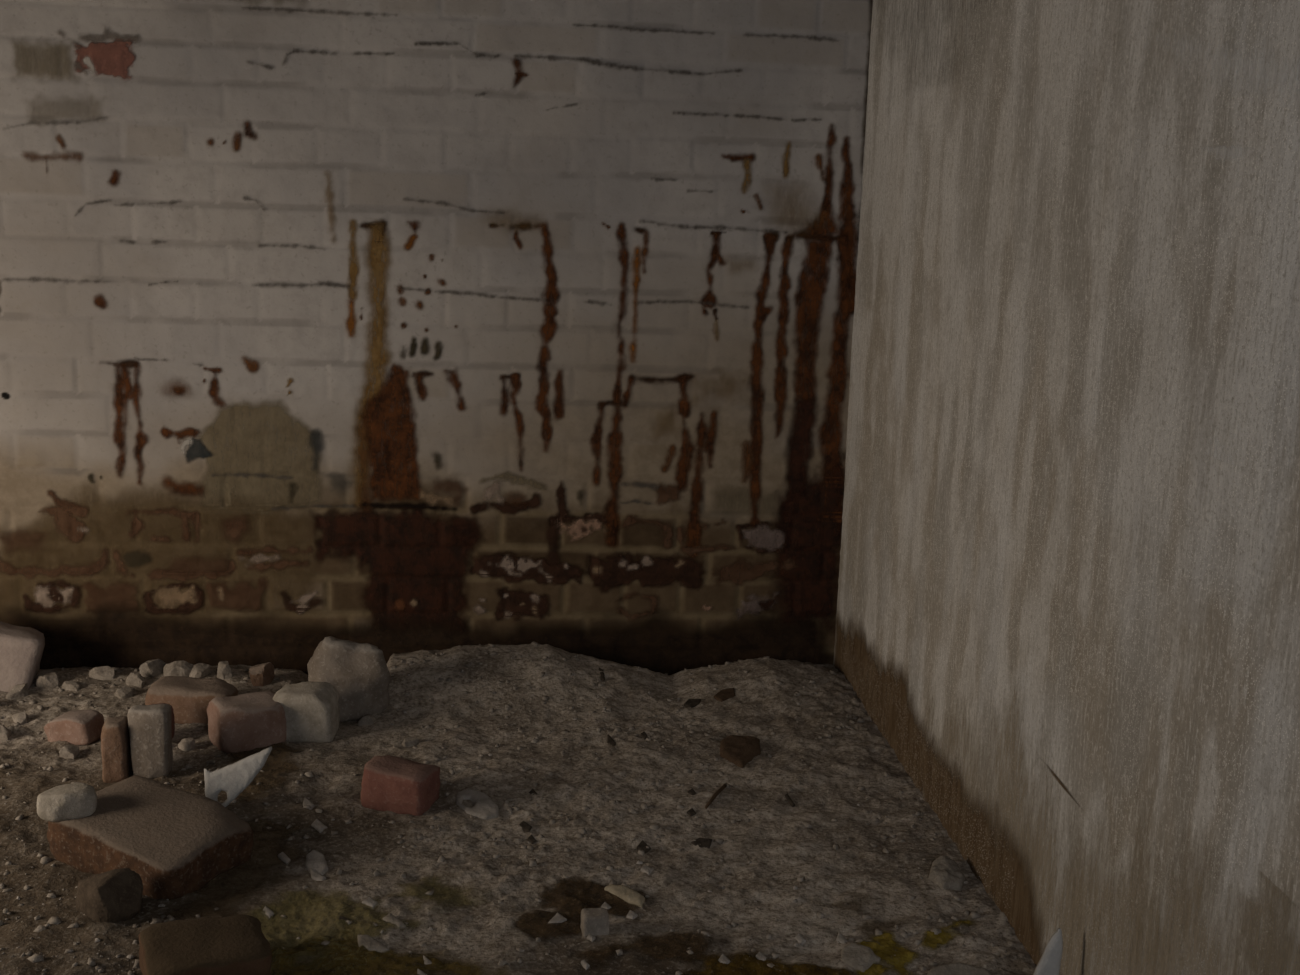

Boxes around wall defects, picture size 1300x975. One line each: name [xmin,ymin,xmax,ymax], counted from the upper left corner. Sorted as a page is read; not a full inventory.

rust [113,360,147,484]
rust [315,220,480,632]
rust [490,223,564,470]
rust [590,223,716,557]
rust [701,231,725,340]
rust [723,154,762,213]
rust [742,125,858,628]
leakage [0,403,1300,975]